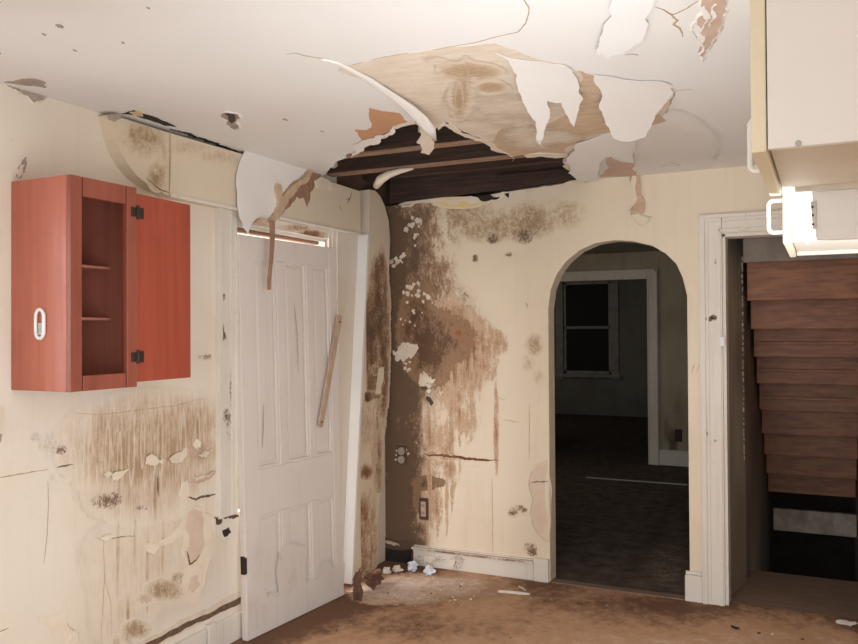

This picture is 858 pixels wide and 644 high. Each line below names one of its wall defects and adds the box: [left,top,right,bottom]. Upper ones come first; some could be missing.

crack [655,1,698,37]
peeling [689,0,729,62]
water stain [115,121,242,194]
peeling [107,110,556,290]
peeling [319,43,673,226]
water stain [423,56,583,150]
water stain [365,196,591,570]
crack [0,464,73,478]
crack [42,495,50,560]
water stain [31,369,231,644]
spalling [138,470,241,644]
crack [419,449,498,461]